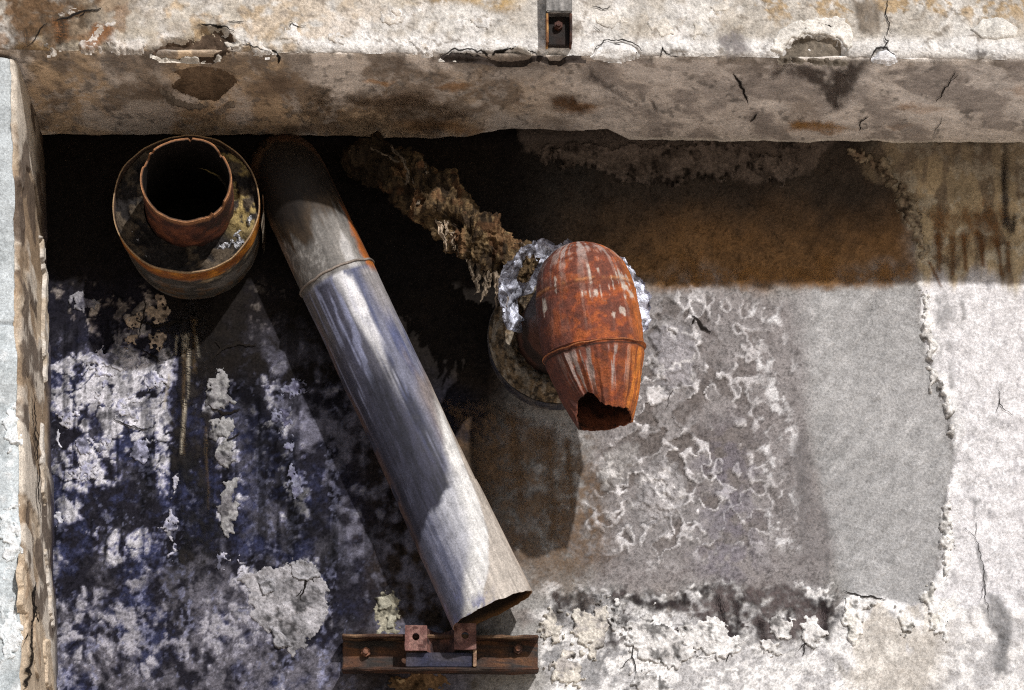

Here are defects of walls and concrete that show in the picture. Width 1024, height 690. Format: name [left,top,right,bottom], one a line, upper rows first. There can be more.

crack [27,8,101,47]
spalling [78,22,274,113]
crack [733,74,757,122]
spalling [770,16,853,67]
damp [797,61,866,107]
peeling [918,289,955,441]
crack [34,394,42,518]
damp [164,299,221,565]
peeling [919,499,956,643]
crack [967,523,989,616]
crack [23,584,39,687]
peeling [840,596,878,646]